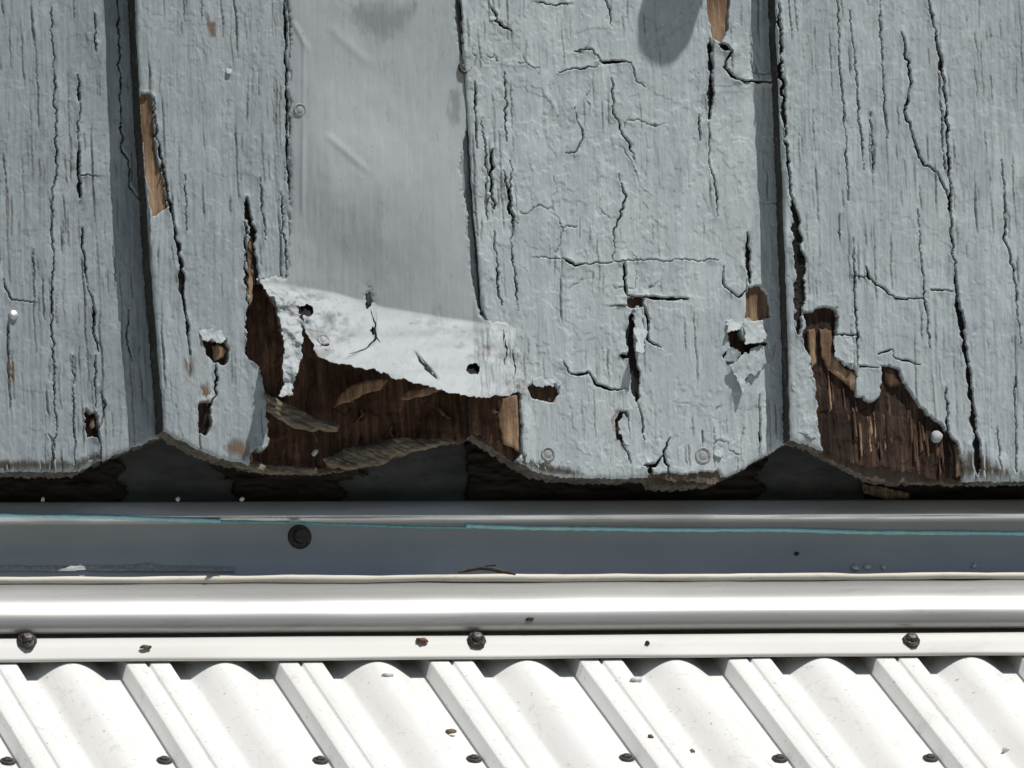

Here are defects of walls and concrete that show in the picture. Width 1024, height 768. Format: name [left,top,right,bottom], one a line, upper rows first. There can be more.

peeling [706,0,729,46]
peeling [140,94,169,217]
crack [152,110,189,350]
crack [243,0,290,306]
crack [473,82,517,378]
peeling [528,376,562,403]
crack [564,187,687,447]
peeling [724,286,776,394]
crack [697,16,805,335]
peeling [792,352,818,438]
peeling [833,335,856,364]
crack [833,5,980,475]